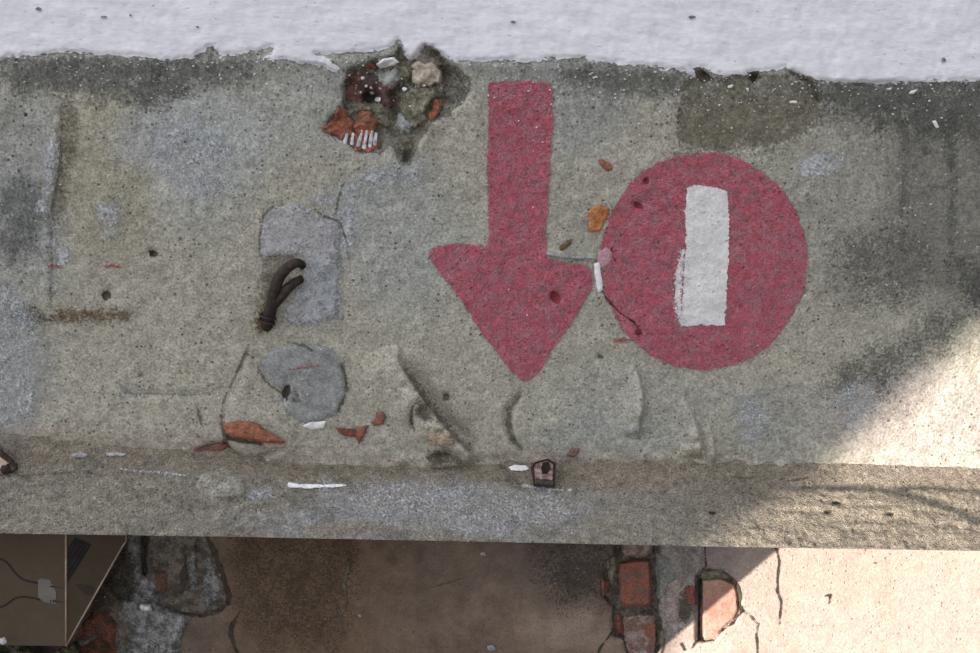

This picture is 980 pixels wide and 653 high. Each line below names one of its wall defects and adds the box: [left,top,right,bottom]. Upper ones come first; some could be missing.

spalling [322,43,471,165]
water stain [551,57,980,434]
rust [29,304,135,327]
spalling [601,545,666,653]
crack [661,637,701,653]
spalling [696,568,740,642]
crack [729,548,782,653]